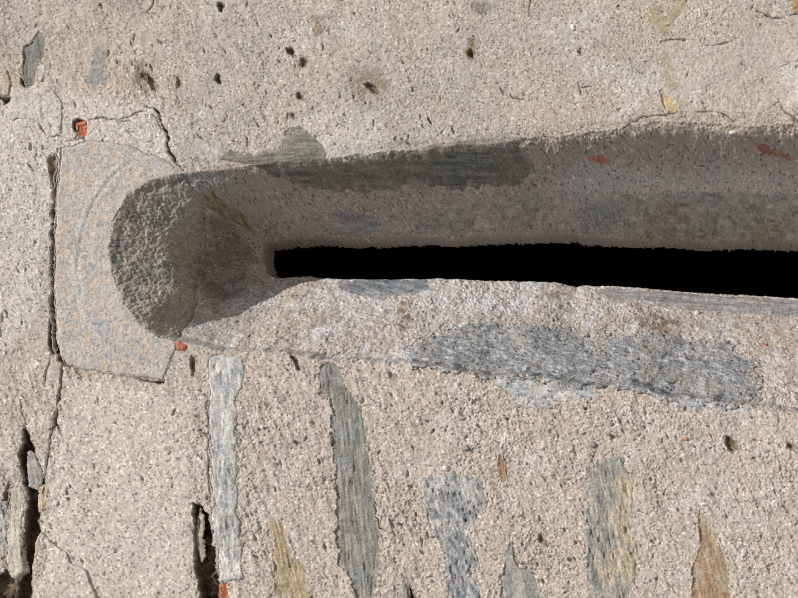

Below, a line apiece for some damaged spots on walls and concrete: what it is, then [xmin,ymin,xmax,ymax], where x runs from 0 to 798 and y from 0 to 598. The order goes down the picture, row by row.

crack [757,11,798,19]
crack [625,110,733,128]
crack [780,104,798,124]
crack [14,106,183,479]